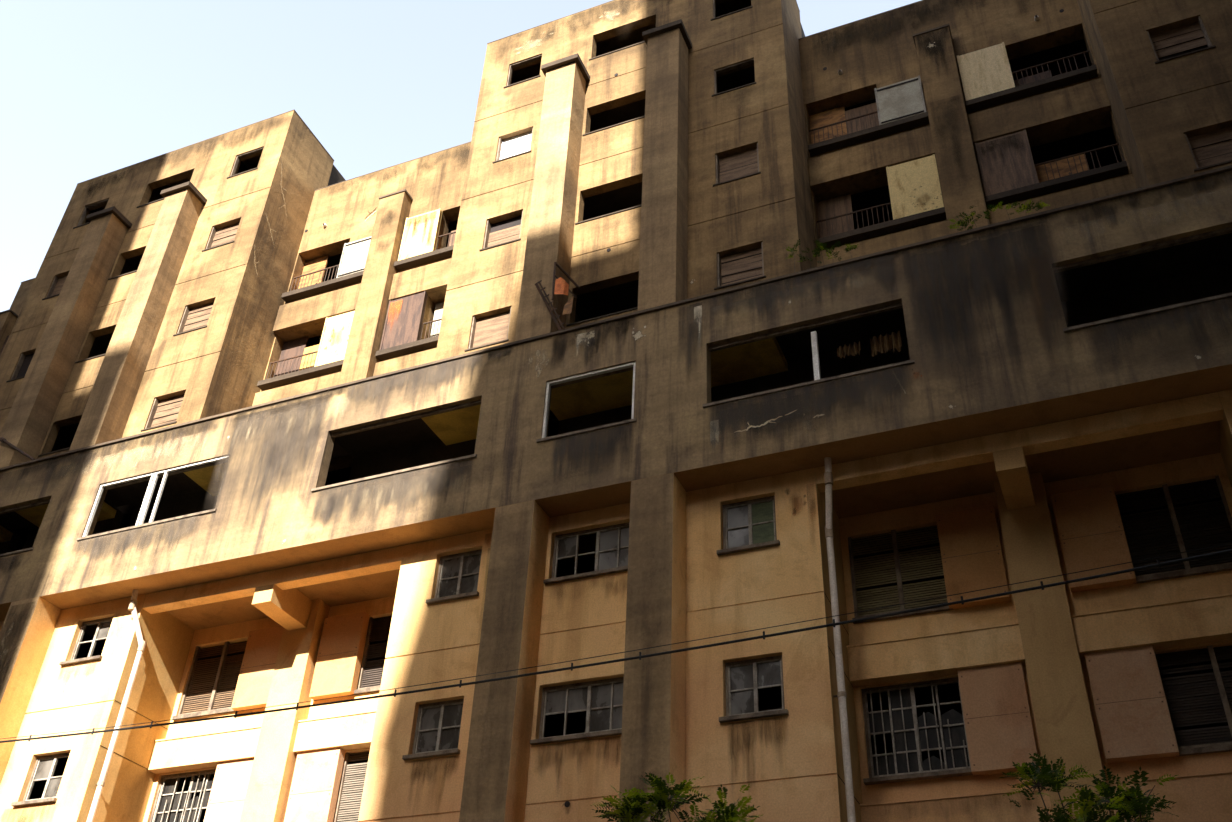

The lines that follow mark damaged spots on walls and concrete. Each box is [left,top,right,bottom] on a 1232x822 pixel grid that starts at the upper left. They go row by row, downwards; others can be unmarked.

water stain [818,0,974,55]
water stain [687,228,998,326]
water stain [555,317,631,357]
water stain [45,420,212,468]
water stain [230,347,508,473]
crack [736,410,824,432]